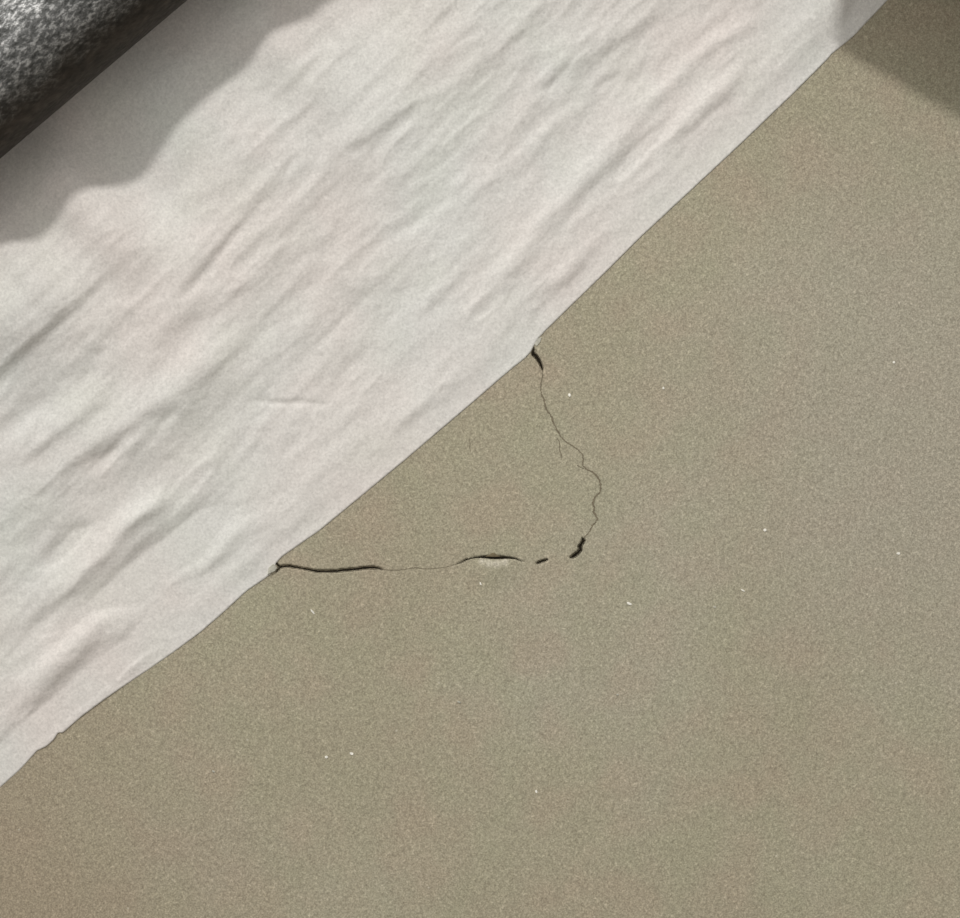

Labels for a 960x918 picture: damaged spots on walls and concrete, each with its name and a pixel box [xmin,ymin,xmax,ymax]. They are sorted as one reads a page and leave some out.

crack [268,337,602,590]